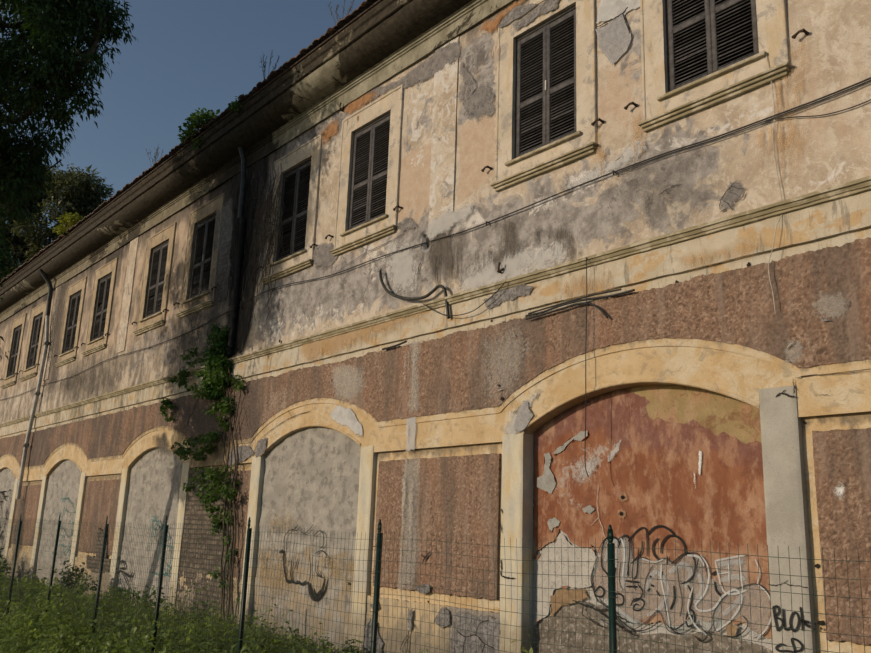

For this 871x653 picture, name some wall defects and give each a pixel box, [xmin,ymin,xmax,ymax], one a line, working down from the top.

spalling [595,0,640,66]
spalling [362,41,495,120]
spalling [719,182,744,211]
water stain [387,243,419,292]
water stain [426,203,576,292]
peeling [330,405,363,437]
spalling [504,393,537,435]
peeling [536,430,588,494]
peeling [573,441,621,484]
peeling [536,517,597,623]